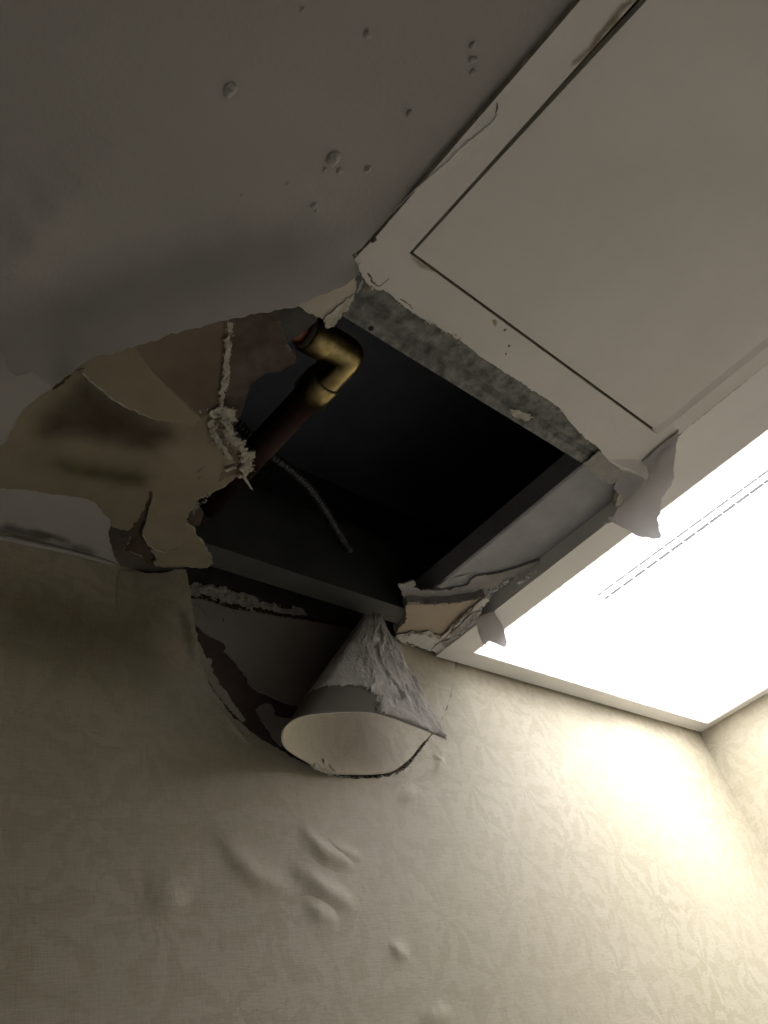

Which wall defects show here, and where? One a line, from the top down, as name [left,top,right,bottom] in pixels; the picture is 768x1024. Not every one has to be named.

spalling [582,450,622,484]
peeling [0,320,460,775]
spalling [398,559,540,599]